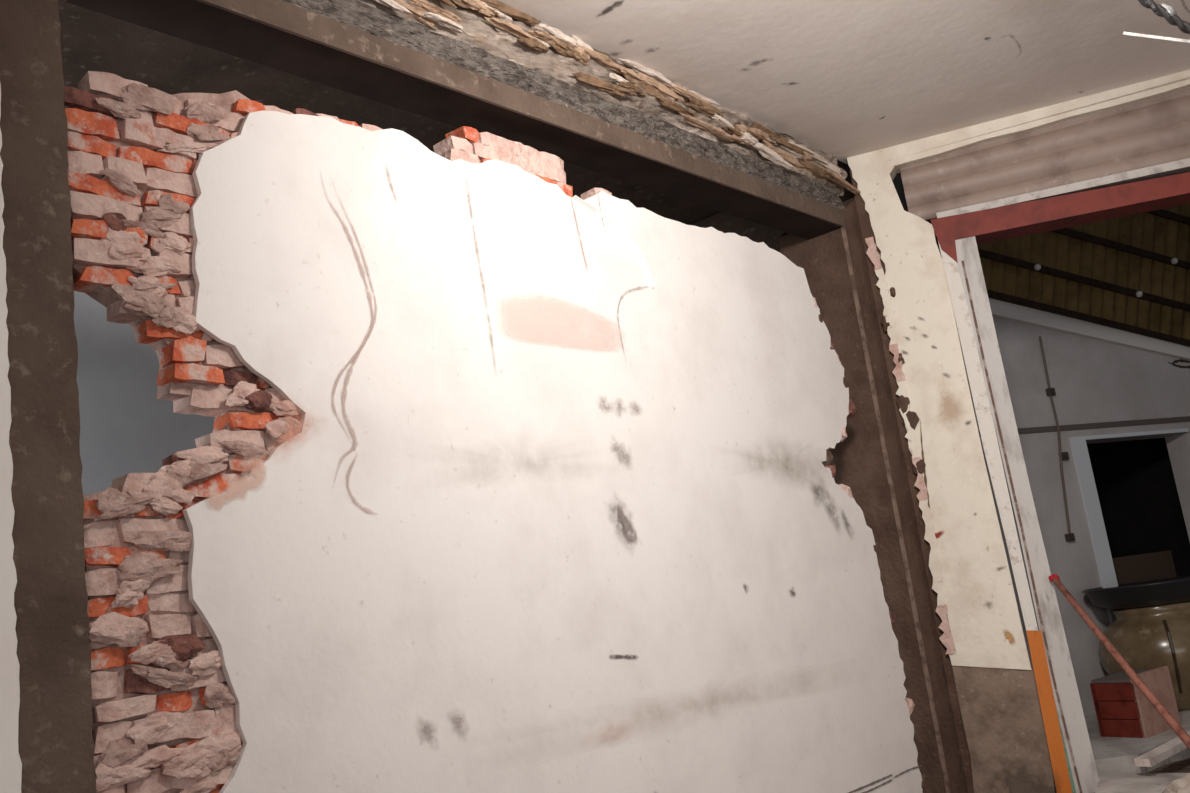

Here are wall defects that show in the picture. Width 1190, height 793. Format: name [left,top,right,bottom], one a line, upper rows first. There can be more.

spalling [358,0,861,197]
flaking render [64,71,383,793]
crack [332,212,377,512]
spalling [865,237,955,654]